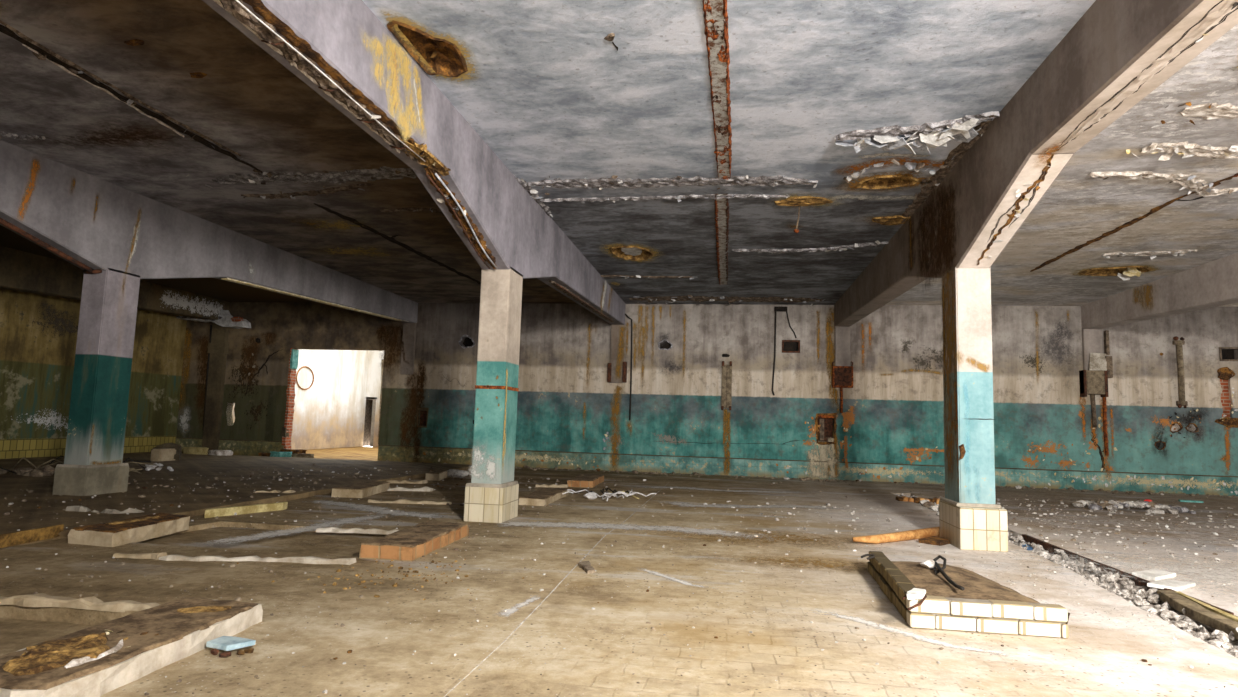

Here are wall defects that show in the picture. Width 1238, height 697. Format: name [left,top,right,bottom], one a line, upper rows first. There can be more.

crack [0,20,268,177]
spalling [235,0,498,269]
damp [363,38,451,176]
corrosion [702,0,732,285]
peeling [828,118,993,200]
crack [977,0,1238,272]
damp [11,408,68,432]
corrosion [611,322,632,470]
flaking render [776,406,944,479]
damp [872,189,956,480]
spalling [1150,367,1238,450]
corrosion [1221,427,1230,470]